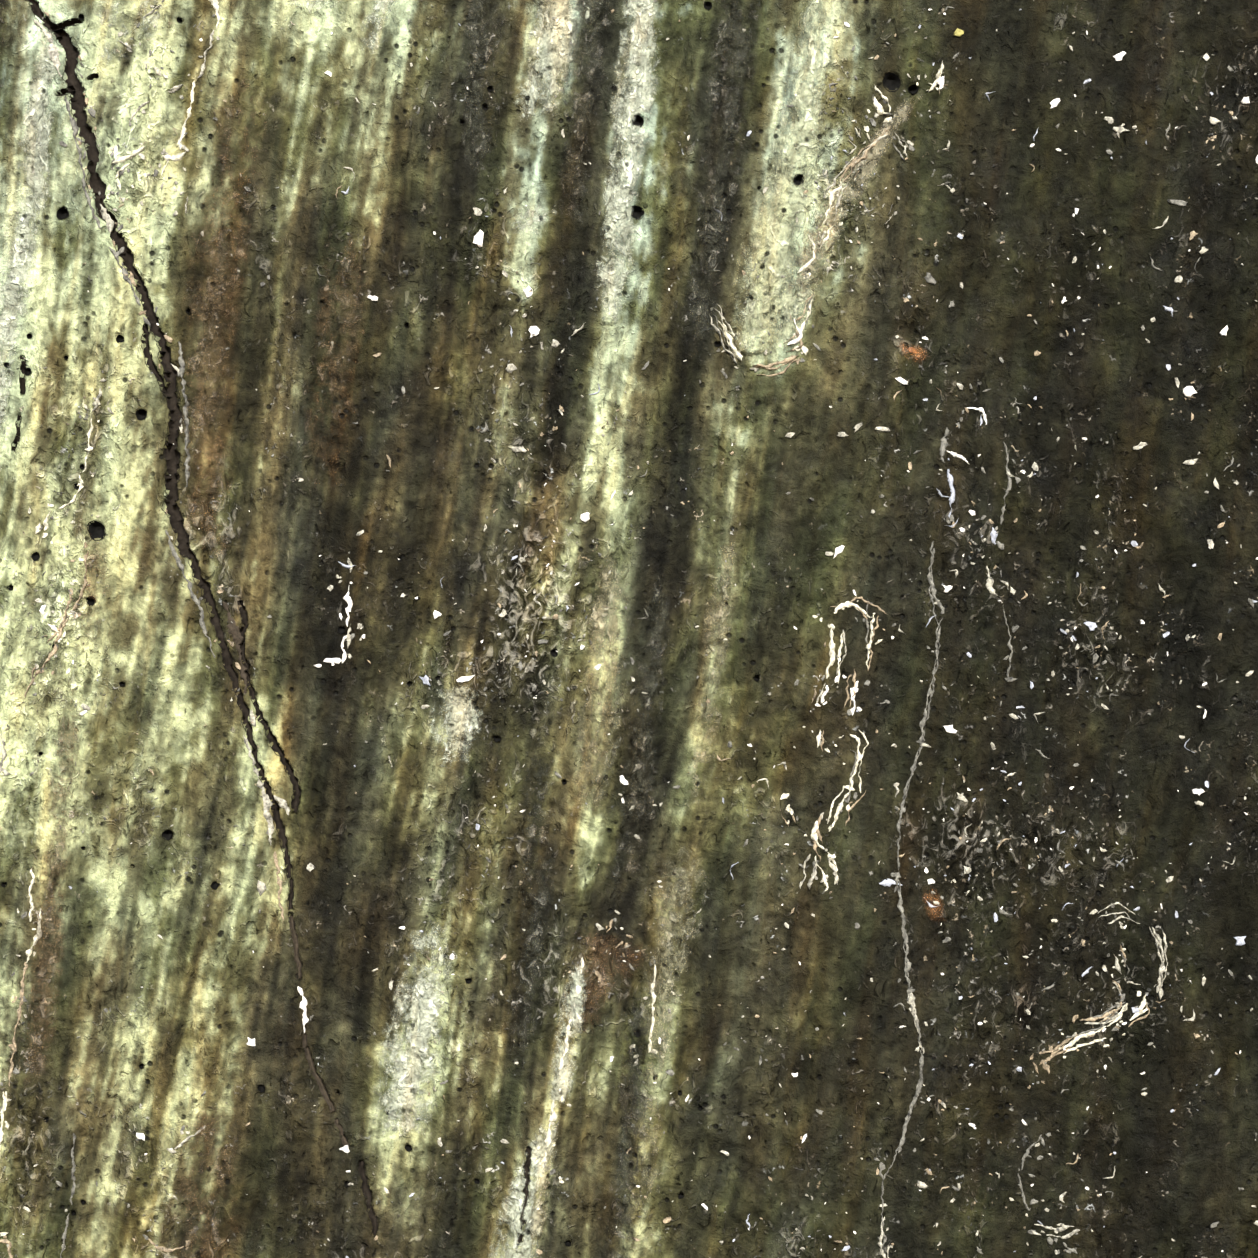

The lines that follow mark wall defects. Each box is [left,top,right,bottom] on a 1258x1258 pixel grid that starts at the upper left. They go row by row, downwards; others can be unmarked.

leakage [0,41,57,423]
leakage [518,0,589,114]
leakage [596,0,658,320]
leakage [736,0,912,347]
crack [27,0,379,1236]
leakage [432,687,478,762]
leakage [579,567,622,801]
leakage [25,716,78,1080]
leakage [376,928,447,1137]
leakage [491,1125,557,1258]
leakage [551,968,585,1102]
leakage [640,850,697,1190]